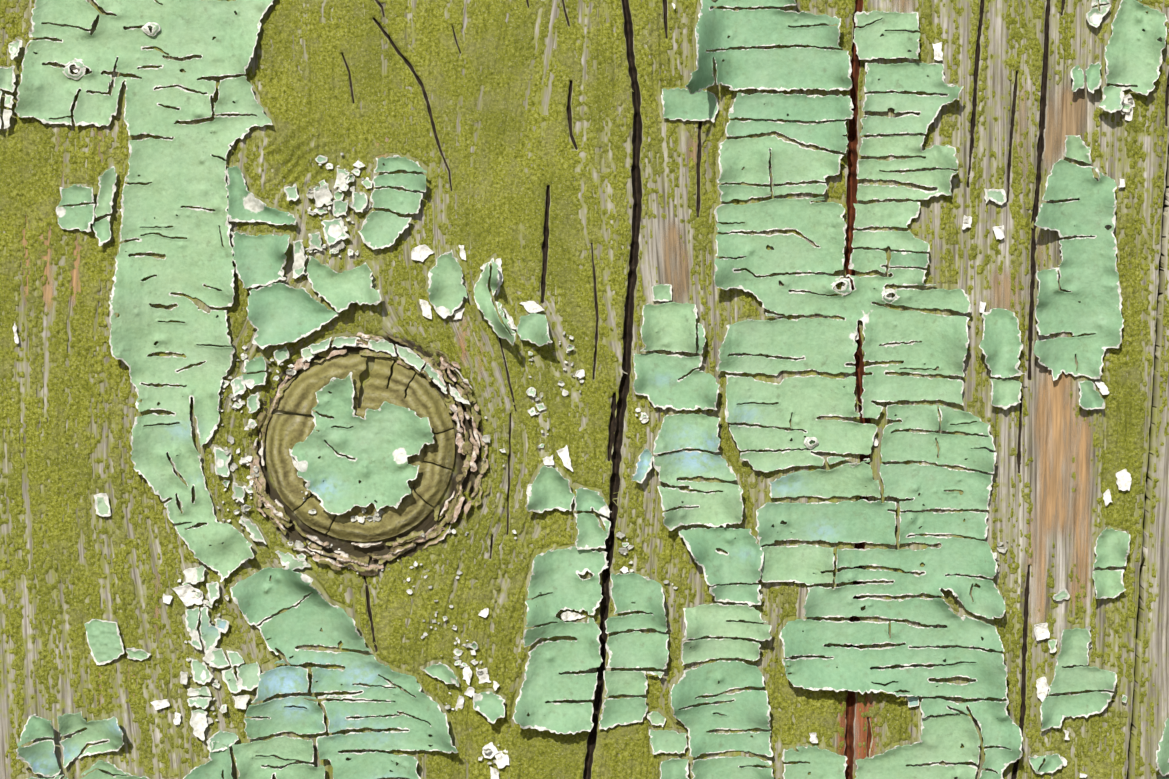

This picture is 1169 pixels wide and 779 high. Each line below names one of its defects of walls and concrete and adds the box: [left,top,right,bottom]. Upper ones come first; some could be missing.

crack [373,0,452,191]
crack [844,0,863,291]
peeling [1070,0,1168,121]
peeling [0,0,509,779]
peeling [411,245,585,416]
crack [583,0,642,779]
peeling [512,0,1067,779]
crack [854,320,871,424]
peeling [1033,135,1125,410]
crack [848,542,865,648]
crack [844,691,872,779]
peeling [1034,622,1127,740]